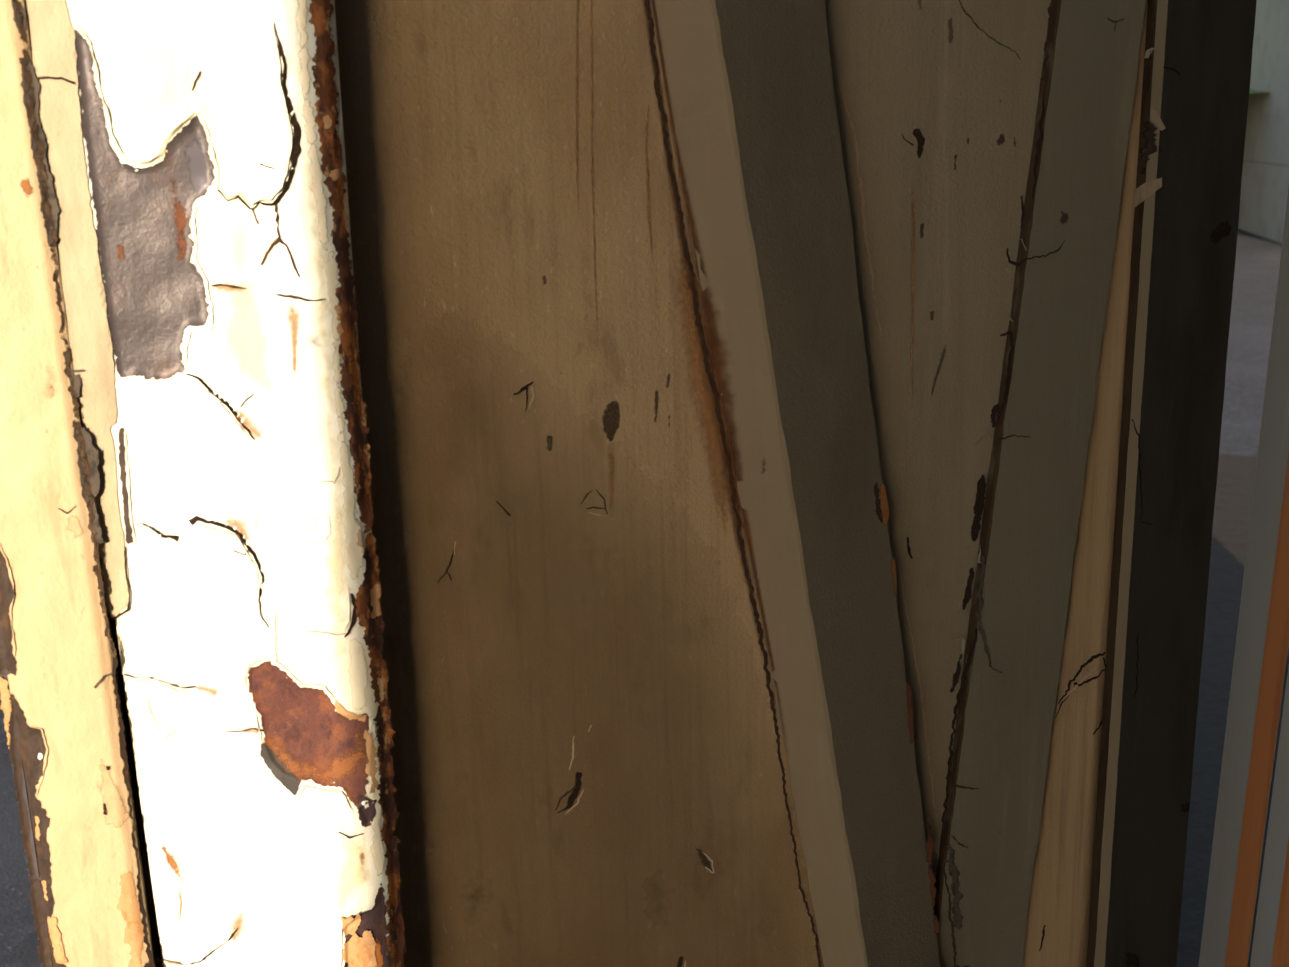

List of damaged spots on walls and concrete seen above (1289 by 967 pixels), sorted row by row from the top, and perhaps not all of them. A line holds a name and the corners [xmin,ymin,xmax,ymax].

peeling [0,545,68,967]
crack [11,0,269,967]
spalling [72,21,219,385]
crack [211,23,301,290]
rust [244,0,408,967]
peeling [324,251,389,967]
crack [644,0,822,967]
crack [990,312,1031,439]
crack [959,0,1068,267]
crack [1055,635,1139,719]
crack [1132,419,1153,526]